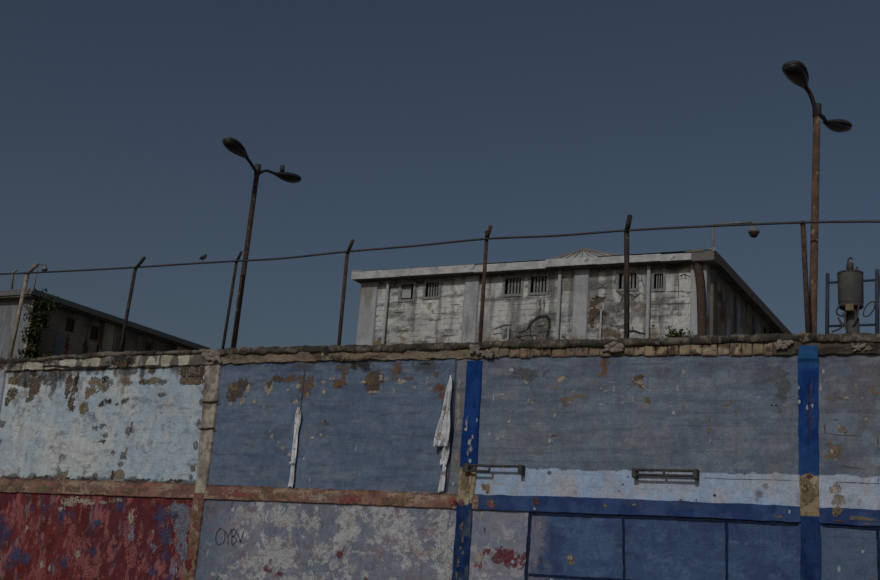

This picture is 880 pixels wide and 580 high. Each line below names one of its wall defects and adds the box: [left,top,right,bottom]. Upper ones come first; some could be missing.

peeling [4,371,41,407]
peeling [64,354,167,414]
peeling [179,366,205,395]
peeling [226,371,348,409]
peeling [361,371,446,400]
peeling [92,423,128,480]
peeling [211,379,477,580]
peeling [800,473,817,512]
peeling [829,481,876,525]
peeling [58,496,123,580]
peeling [106,505,158,580]
peeling [161,502,201,580]